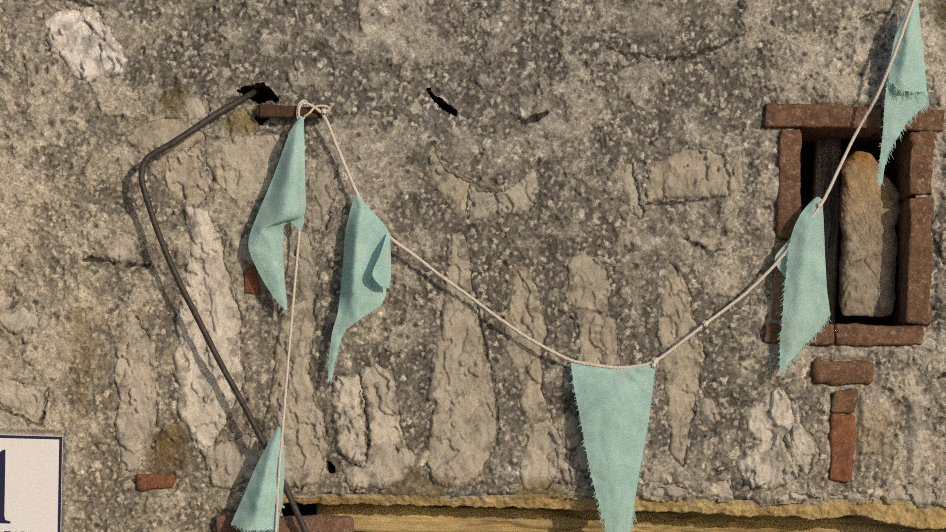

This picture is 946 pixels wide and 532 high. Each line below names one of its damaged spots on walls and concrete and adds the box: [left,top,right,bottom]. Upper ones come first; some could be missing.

crack [606,34,738,67]